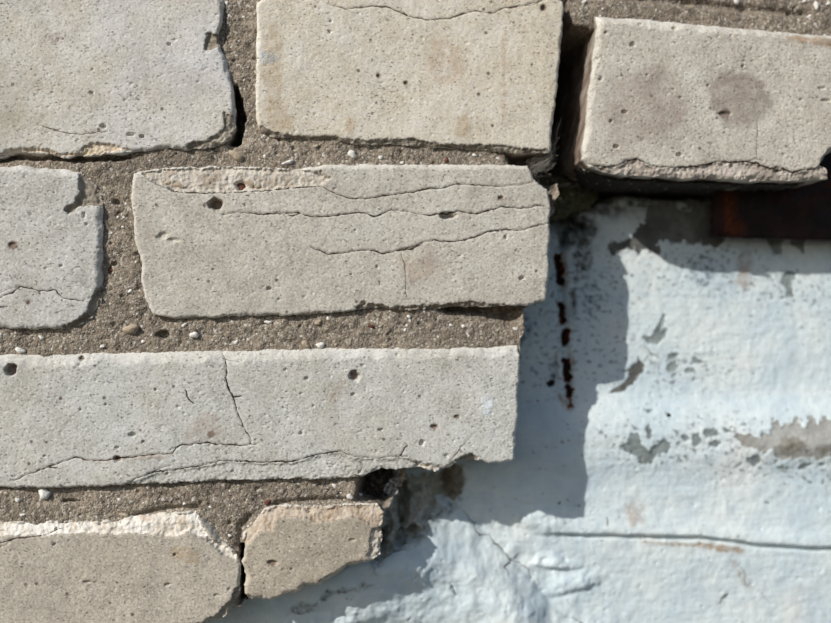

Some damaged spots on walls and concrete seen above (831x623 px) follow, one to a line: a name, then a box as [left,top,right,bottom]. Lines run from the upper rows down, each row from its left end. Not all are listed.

crack [332,0,543,20]
crack [138,174,549,303]
peeling [608,198,725,258]
crack [0,286,94,307]
corrosion [553,253,567,286]
corrosion [556,301,572,347]
corrosion [555,355,575,409]
crack [14,353,408,484]
peeling [620,425,671,465]
peeling [681,415,831,471]
spalling [0,511,237,559]
spalling [128,452,478,564]